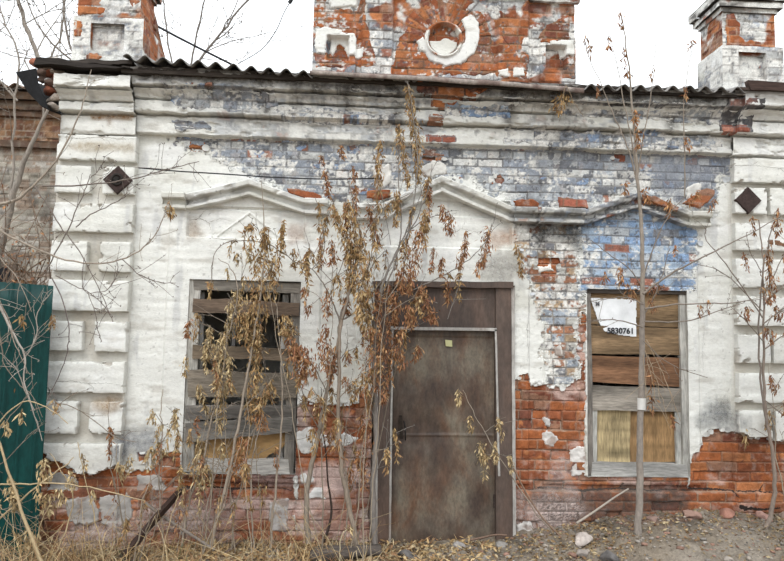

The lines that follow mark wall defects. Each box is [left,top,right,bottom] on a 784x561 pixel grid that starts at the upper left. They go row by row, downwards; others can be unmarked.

flaking render [74,0,105,37]
peeling [159,0,784,532]
flaking render [38,386,372,557]